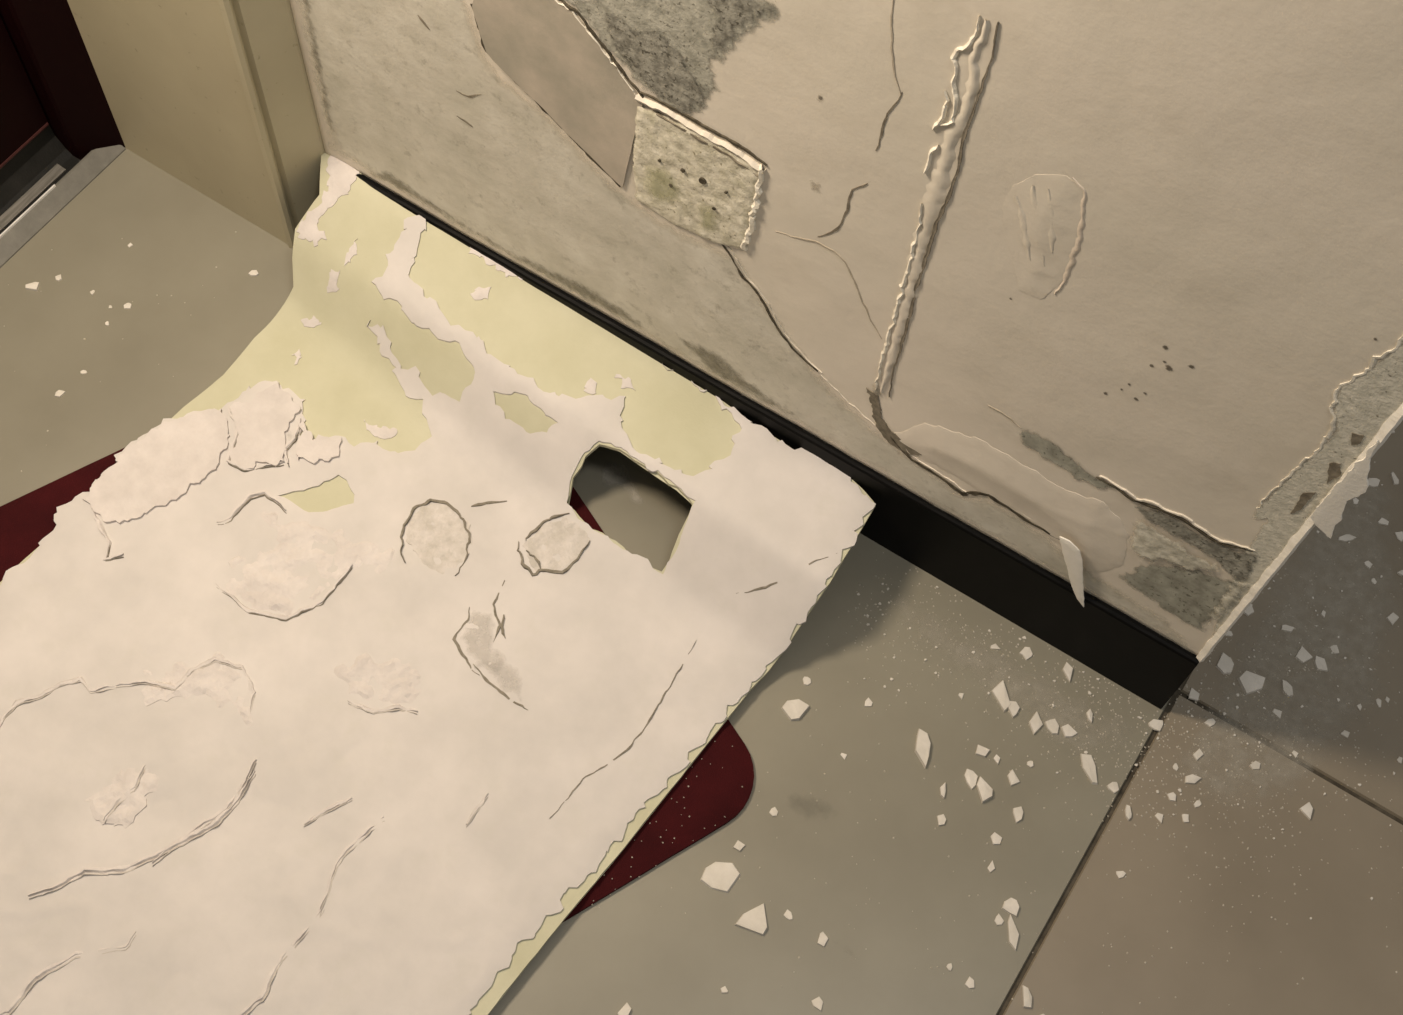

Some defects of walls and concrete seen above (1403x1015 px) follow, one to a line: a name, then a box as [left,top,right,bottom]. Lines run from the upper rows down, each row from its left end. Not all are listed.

crack [721,244,822,373]
peeling [304,0,1403,740]
crack [775,0,1060,540]